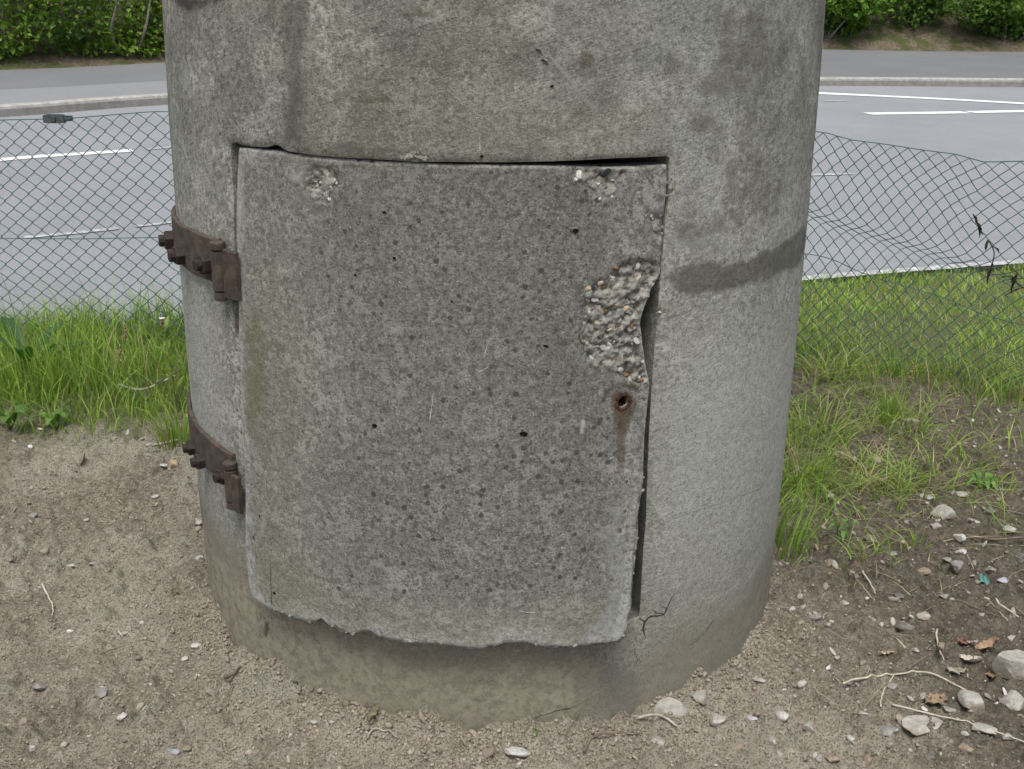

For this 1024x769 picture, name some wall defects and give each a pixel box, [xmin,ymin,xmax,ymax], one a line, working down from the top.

spalling [303,166,338,201]
damp [676,230,806,291]
spalling [579,251,662,385]
crack [635,593,675,663]